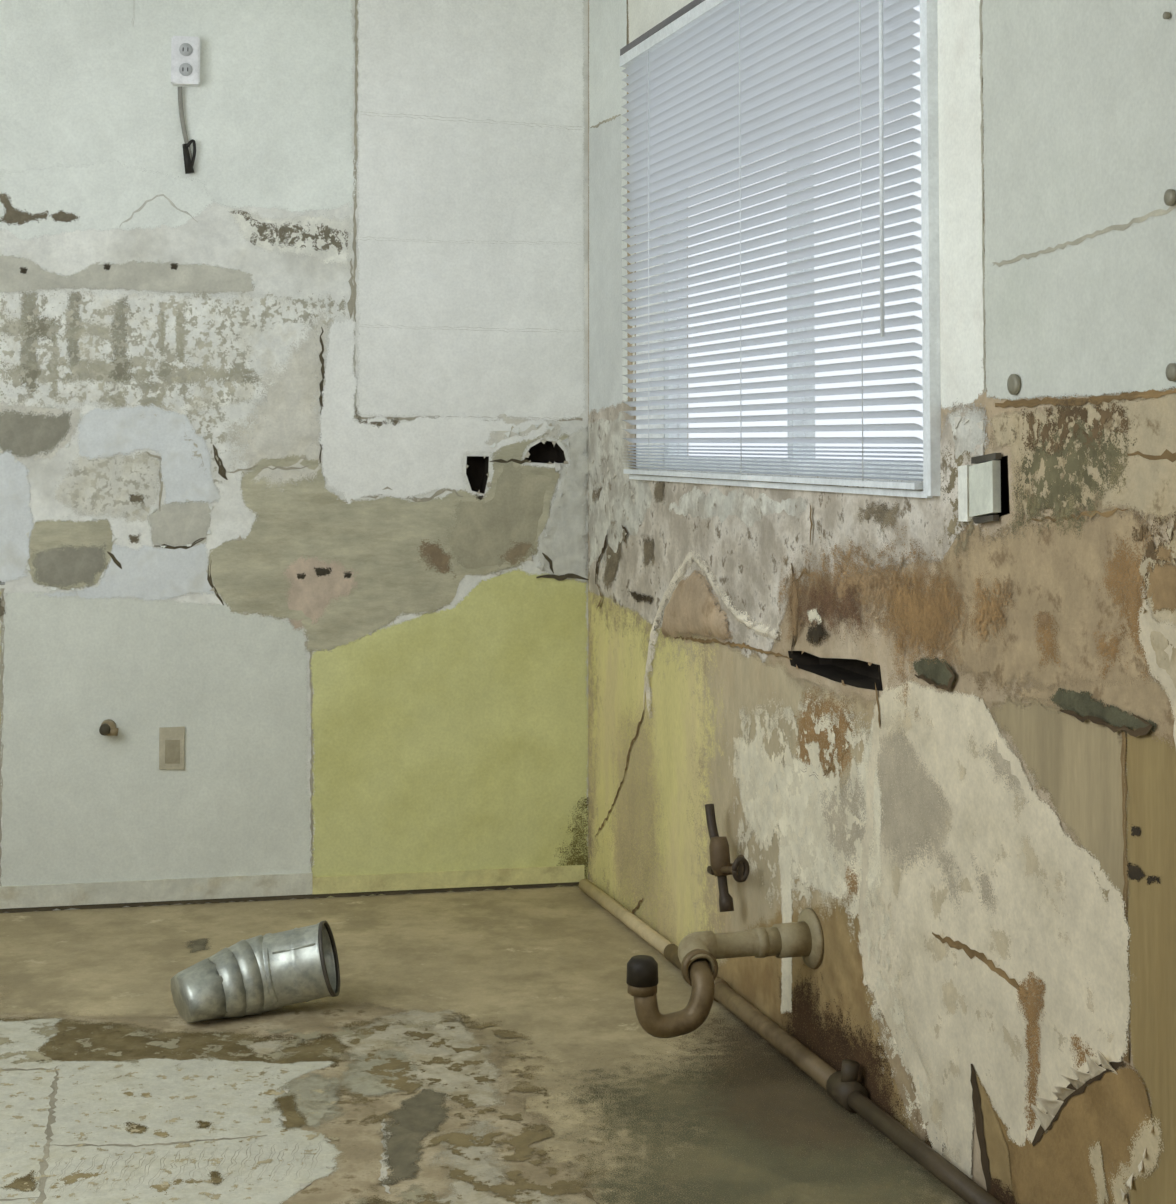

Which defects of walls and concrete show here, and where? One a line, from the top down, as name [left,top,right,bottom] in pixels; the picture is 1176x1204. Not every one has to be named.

flaking render [0,192,80,226]
flaking render [0,253,255,295]
crack [979,0,1176,408]
flaking render [0,401,84,462]
flaking render [25,518,122,591]
damp [1007,393,1137,540]
crack [1027,508,1127,522]
crack [1128,449,1176,462]
peeling [146,308,1176,1204]
crack [1120,731,1129,983]
damp [539,1008,968,1204]
damp [777,964,905,1123]